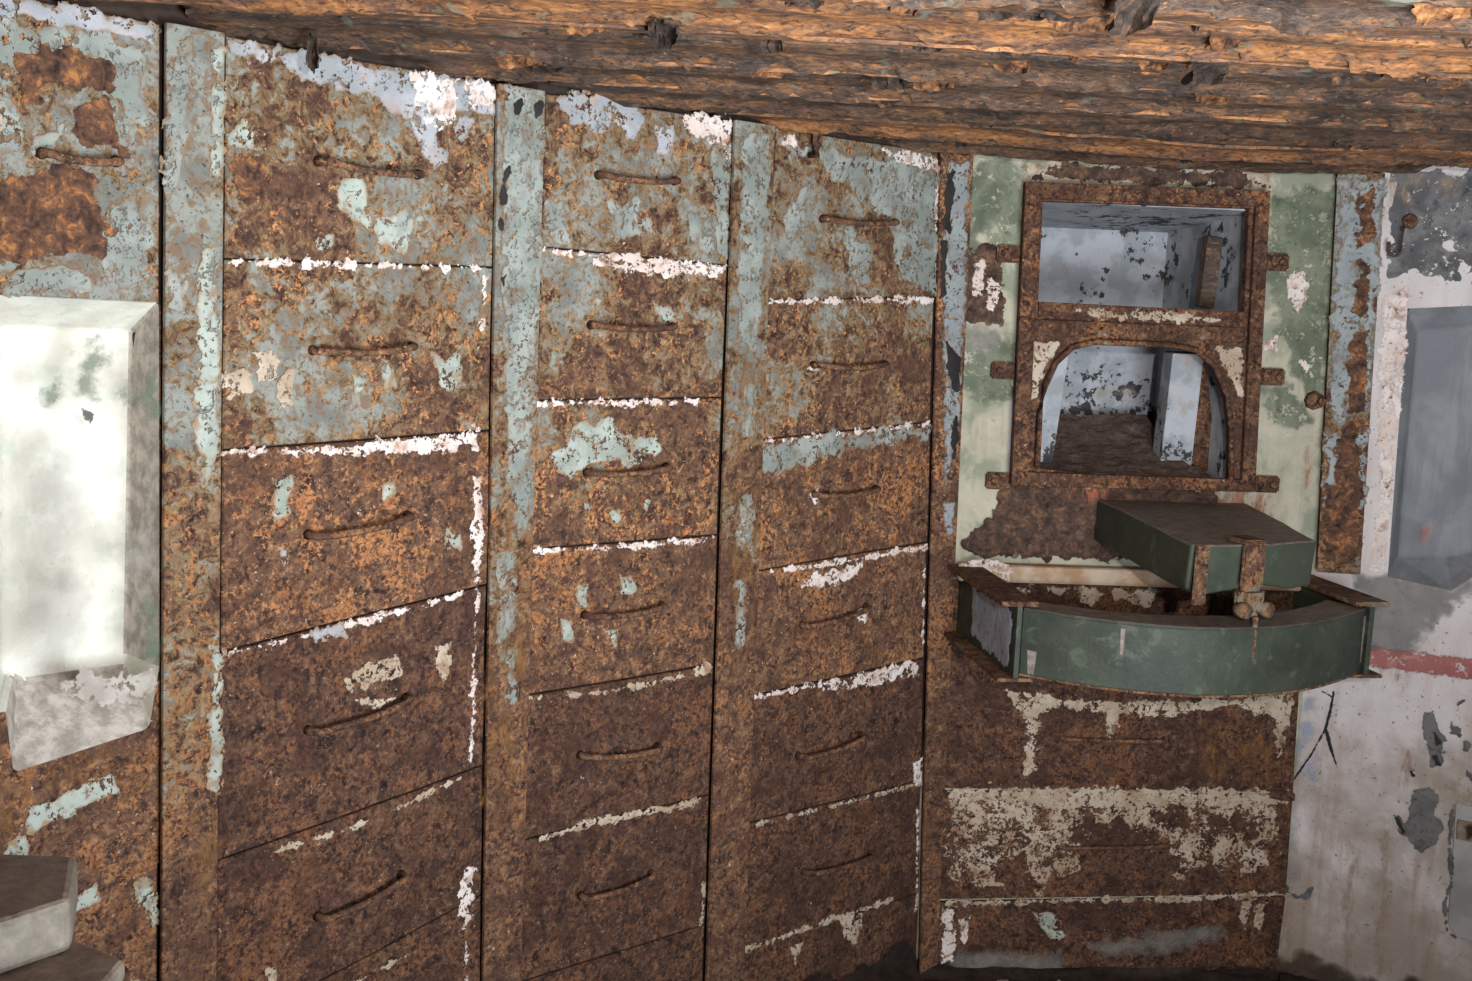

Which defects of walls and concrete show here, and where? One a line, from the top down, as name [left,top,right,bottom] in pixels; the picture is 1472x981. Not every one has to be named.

rust [12,43,131,159]
rust [0,156,119,267]
peeling [0,0,1025,810]
rust [73,0,1472,568]
peeling [1031,341,1060,400]
peeling [1215,168,1472,510]
peeling [1027,650,1037,674]
peeling [940,689,1295,964]
spalling [1394,700,1471,854]